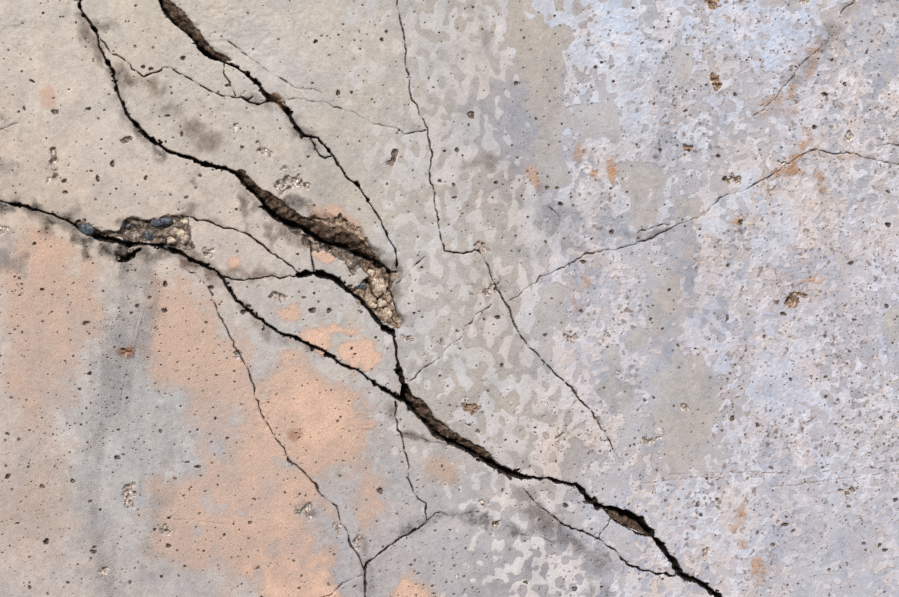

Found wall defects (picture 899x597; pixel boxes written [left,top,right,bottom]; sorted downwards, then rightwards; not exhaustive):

hole [273,166,311,196]
crack [752,149,861,186]
crack [0,200,80,230]
spalling [75,214,215,260]
spalling [268,291,288,302]
crack [78,0,722,597]
peeling [284,0,899,597]